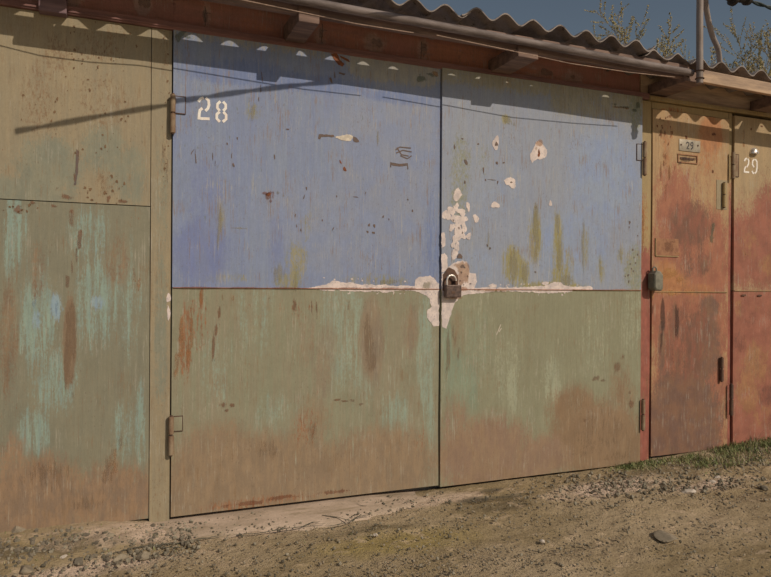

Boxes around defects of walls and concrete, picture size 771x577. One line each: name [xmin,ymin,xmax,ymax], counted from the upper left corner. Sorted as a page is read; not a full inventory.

peeling [530,141,547,162]
peeling [311,188,593,329]
corrosion [652,299,665,347]